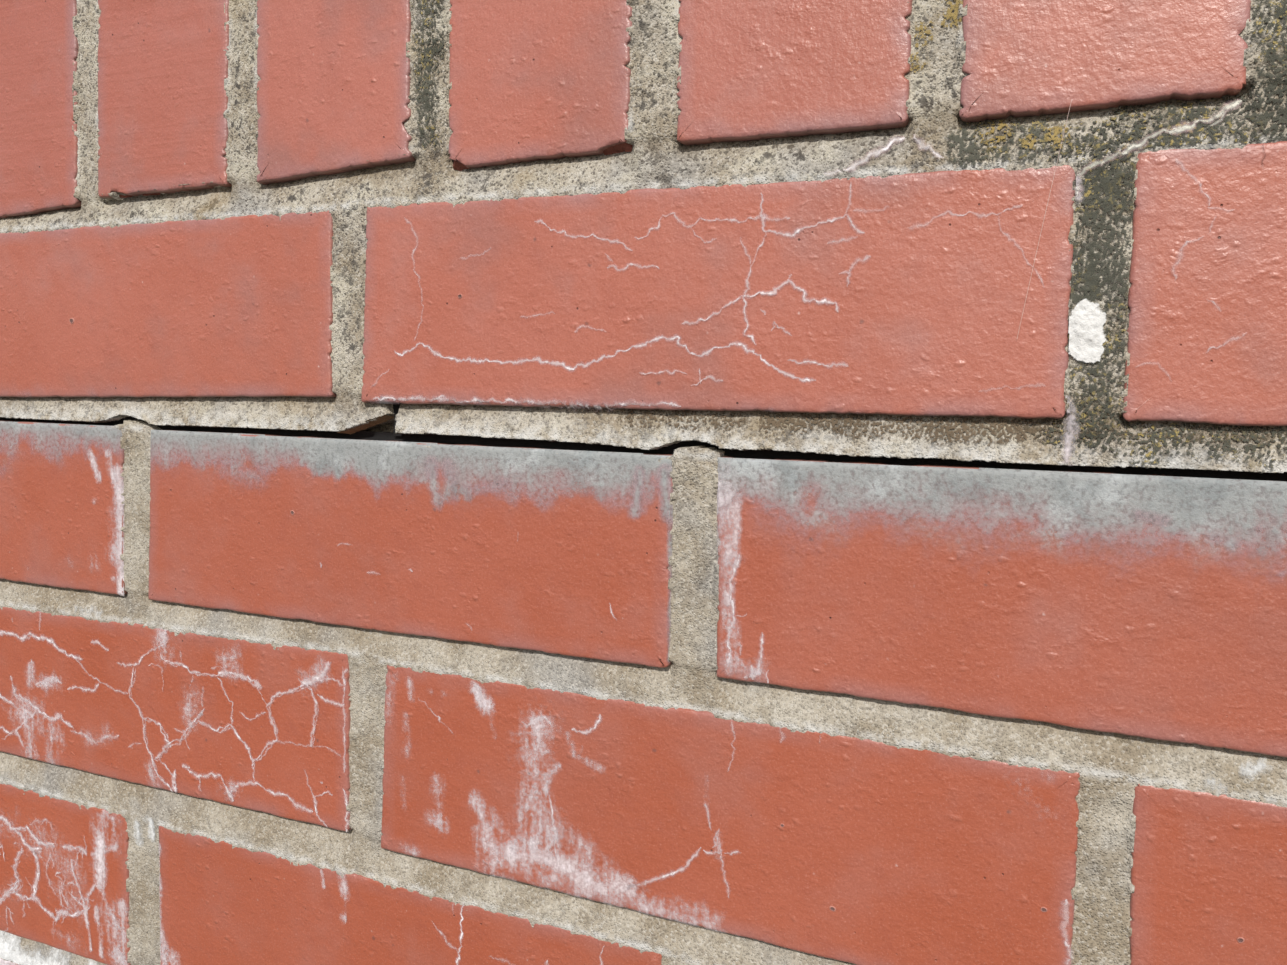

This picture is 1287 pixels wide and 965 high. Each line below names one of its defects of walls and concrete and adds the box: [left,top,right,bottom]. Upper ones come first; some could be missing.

crack [395,218,854,382]
damp [0,421,125,596]
damp [150,430,673,557]
crack [0,403,1287,481]
damp [620,396,1287,573]
crack [0,631,347,832]
damp [472,684,493,711]
crack [0,817,84,920]
damp [471,717,717,932]